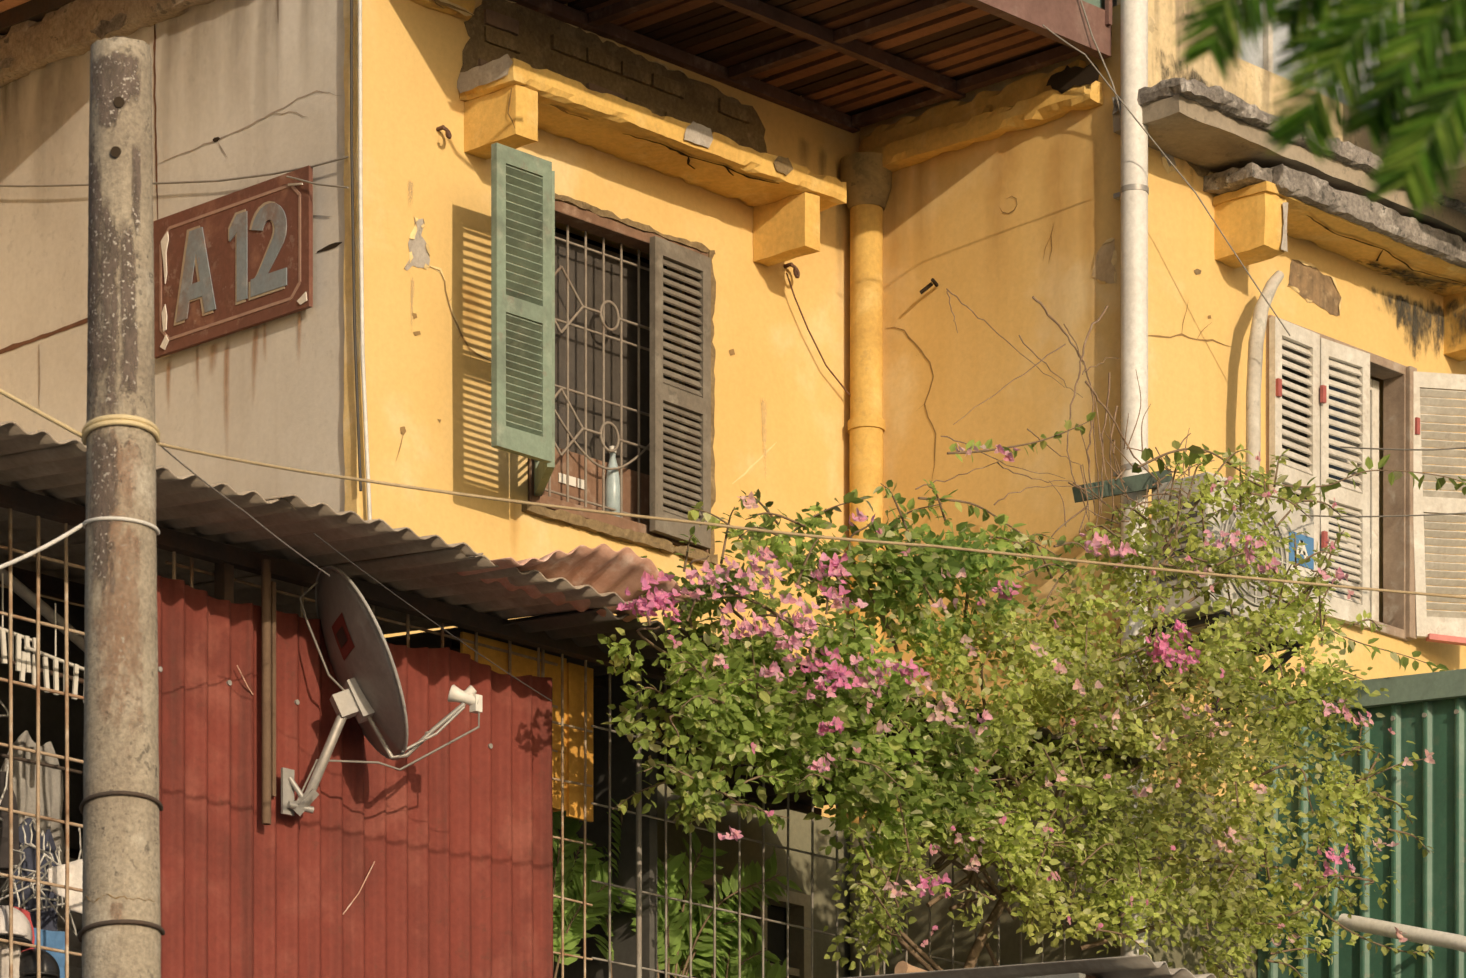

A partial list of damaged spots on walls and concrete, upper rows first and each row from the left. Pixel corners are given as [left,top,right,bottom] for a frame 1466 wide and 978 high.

crack [153,24,339,219]
flaking render [457,0,793,175]
crack [626,134,779,184]
spalling [404,217,430,271]
spalling [1091,238,1117,284]
spalling [1281,202,1342,316]
damp [1368,262,1466,352]
crack [886,327,936,487]